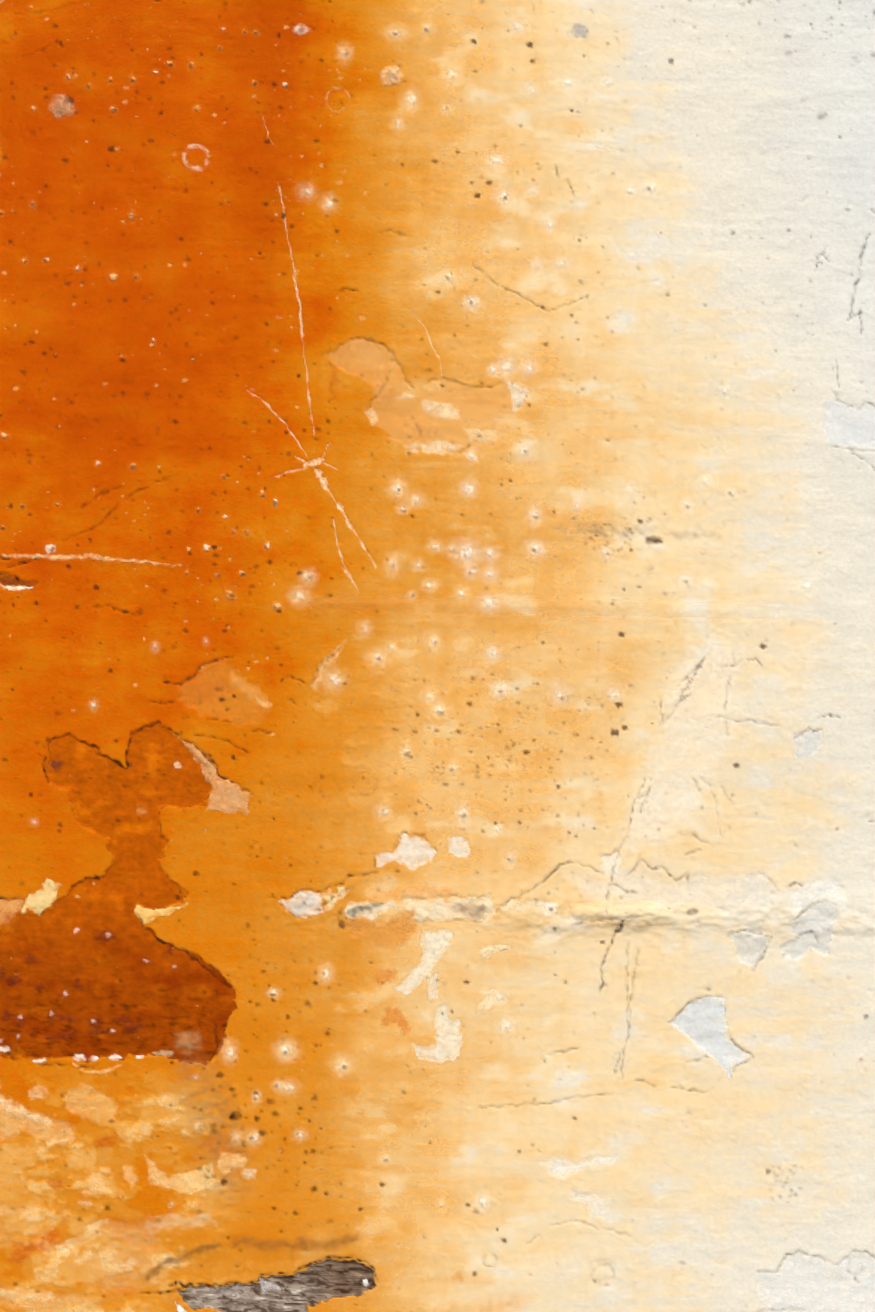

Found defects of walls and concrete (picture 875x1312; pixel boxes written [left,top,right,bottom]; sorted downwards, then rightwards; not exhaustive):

rust [0,0,633,1312]
peeling [385,838,434,865]
peeling [0,722,248,1111]
peeling [672,996,745,1077]
spalling [177,1259,376,1312]